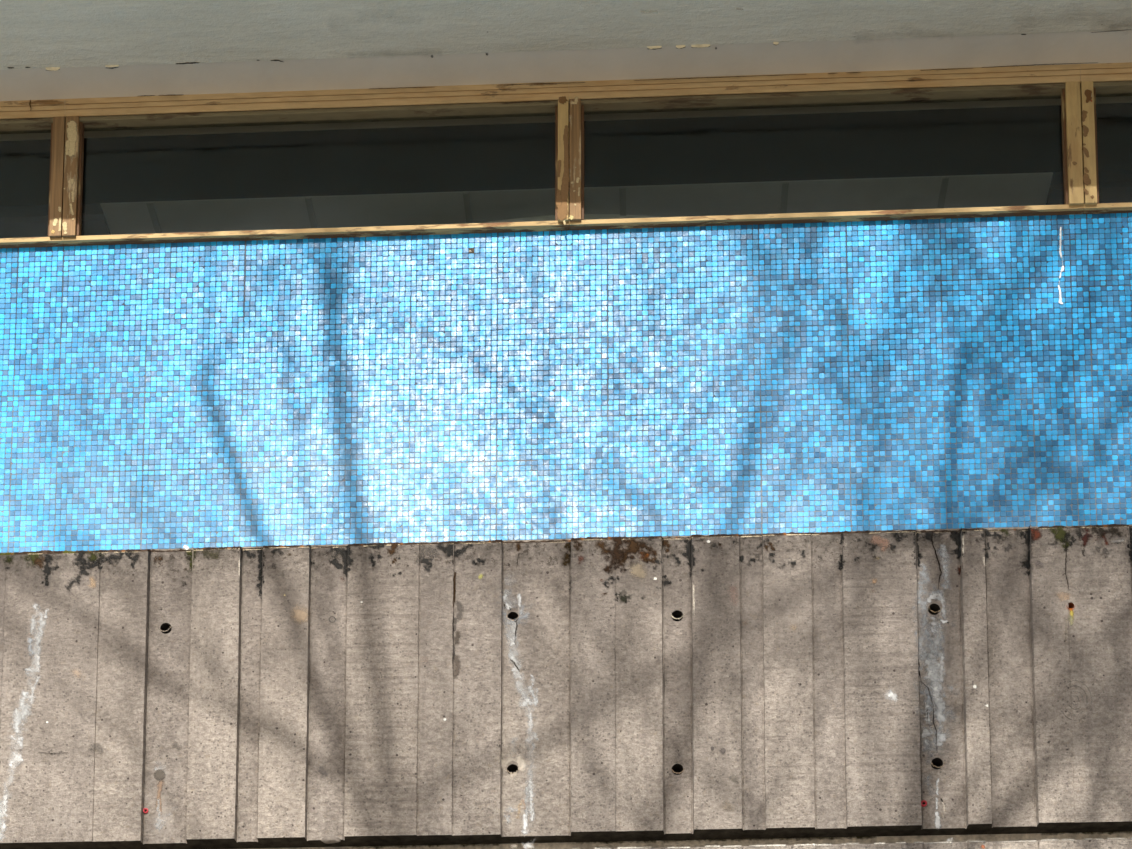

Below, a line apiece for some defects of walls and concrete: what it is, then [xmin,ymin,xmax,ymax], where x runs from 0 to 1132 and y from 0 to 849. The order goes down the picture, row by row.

damp [5,553,53,586]
damp [65,551,139,590]
crack [931,532,942,589]
damp [981,529,1002,558]
damp [0,604,47,839]
damp [503,594,538,741]
damp [869,528,965,746]
crack [918,659,937,746]
damp [501,755,534,848]
damp [874,777,951,844]